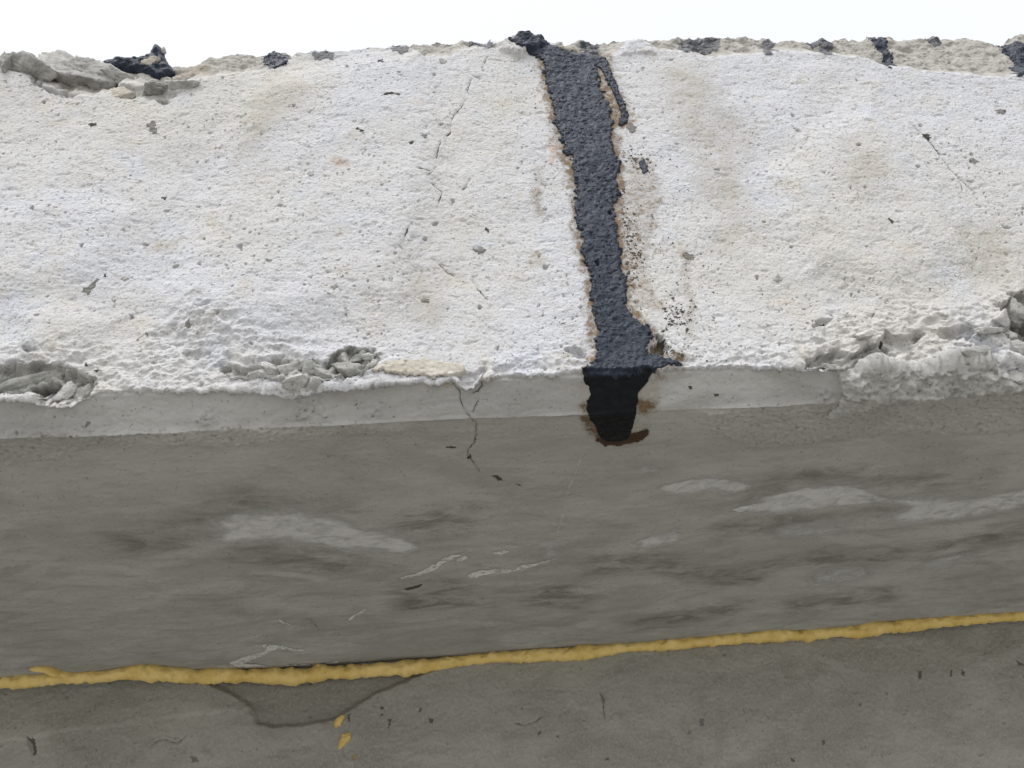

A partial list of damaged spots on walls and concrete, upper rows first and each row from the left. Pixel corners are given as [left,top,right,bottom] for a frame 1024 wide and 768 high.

crack [419,61,486,201]
spalling [0,360,101,404]
spalling [222,345,468,393]
spalling [806,329,888,372]
spalling [973,291,1024,356]
crack [456,374,483,471]